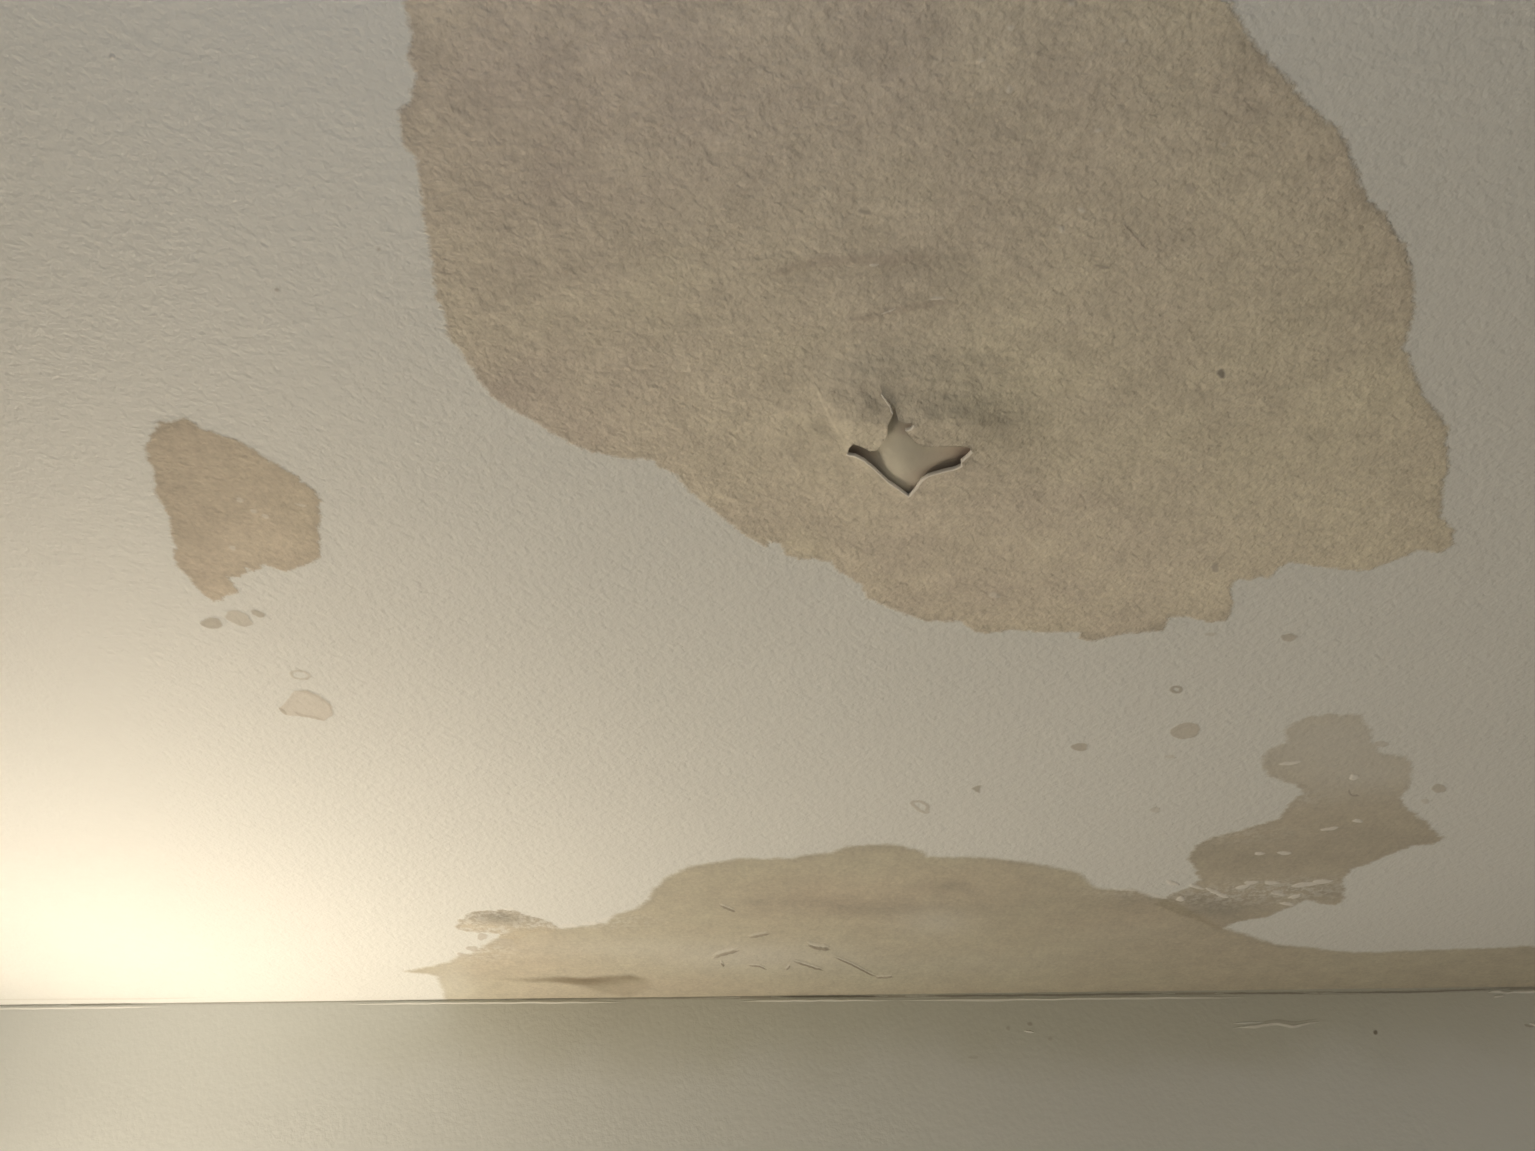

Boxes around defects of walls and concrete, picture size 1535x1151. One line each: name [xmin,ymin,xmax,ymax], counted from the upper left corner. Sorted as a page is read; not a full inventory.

damp [385,0,1464,645]
damp [133,412,330,630]
damp [276,668,337,722]
damp [395,708,1535,1000]